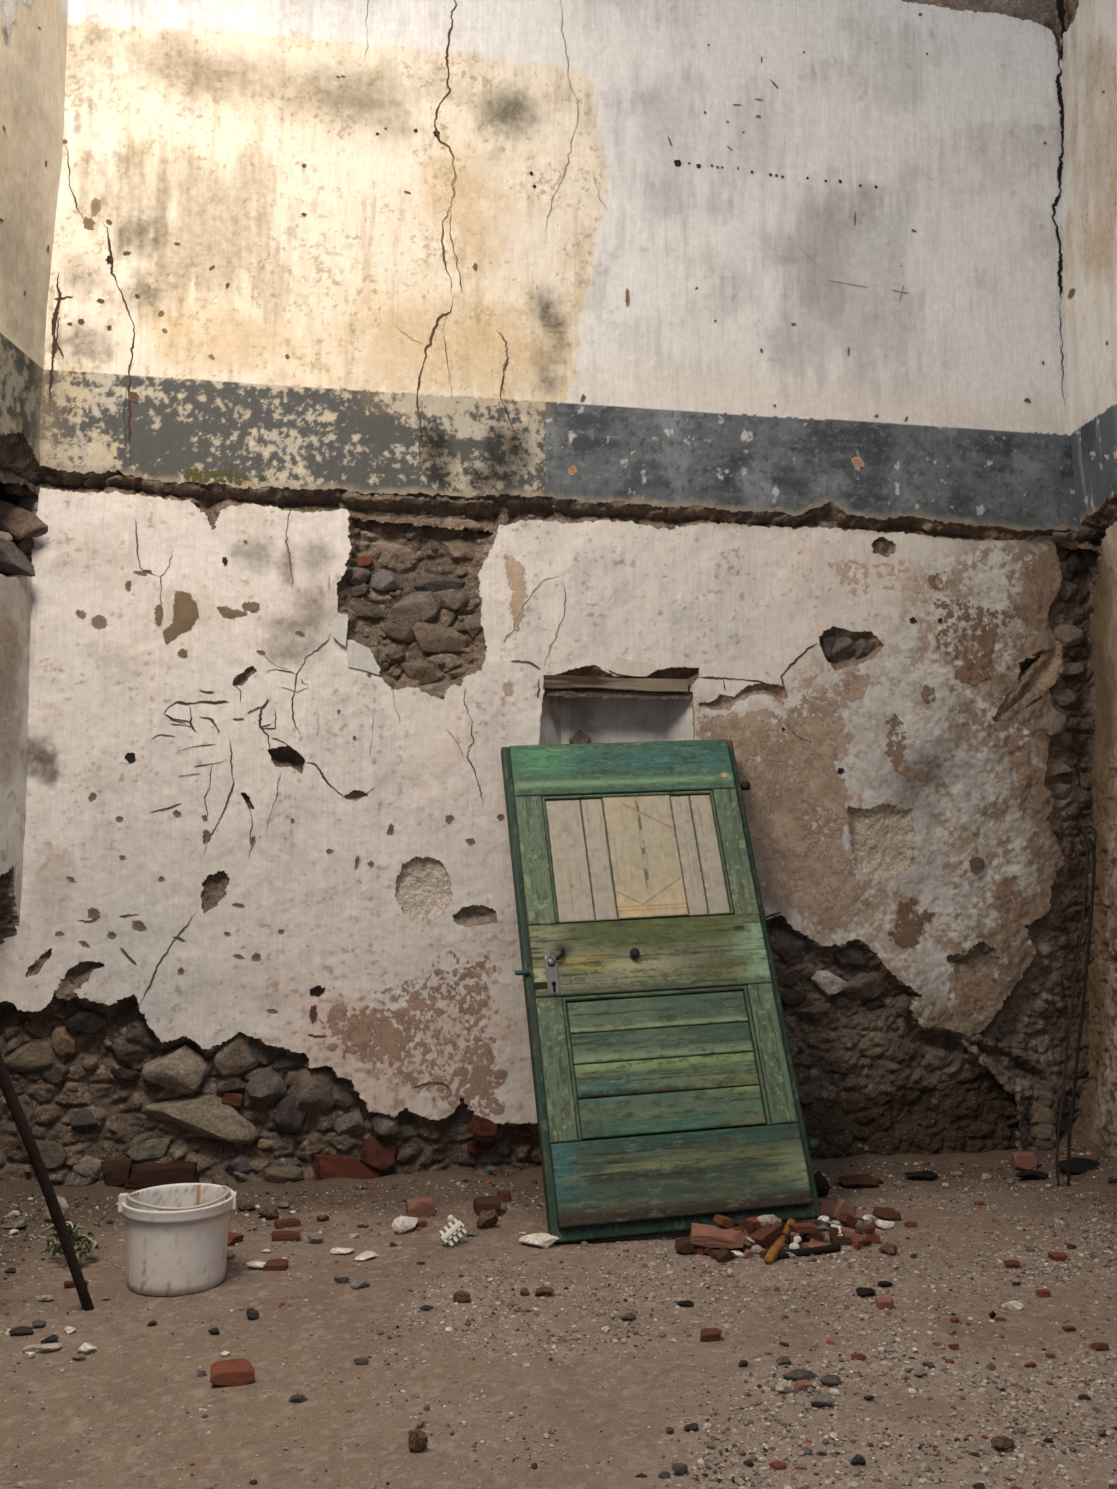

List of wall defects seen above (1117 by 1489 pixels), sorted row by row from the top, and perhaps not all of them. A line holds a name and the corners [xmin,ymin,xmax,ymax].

crack [393,0,463,460]
crack [546,1,606,226]
crack [1052,0,1066,406]
crack [134,517,172,605]
crack [285,508,293,586]
crack [149,639,400,860]
crack [446,693,483,805]
flaking render [0,433,1117,1189]